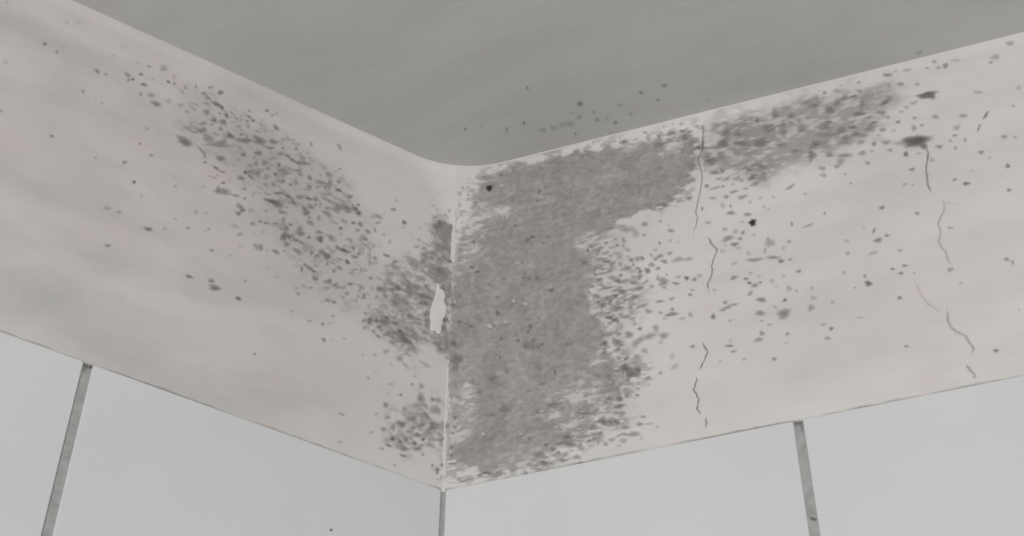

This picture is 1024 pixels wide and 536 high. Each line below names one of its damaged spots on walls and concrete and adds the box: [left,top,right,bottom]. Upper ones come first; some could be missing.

peeling [430,285,456,334]
leakage [392,122,797,477]